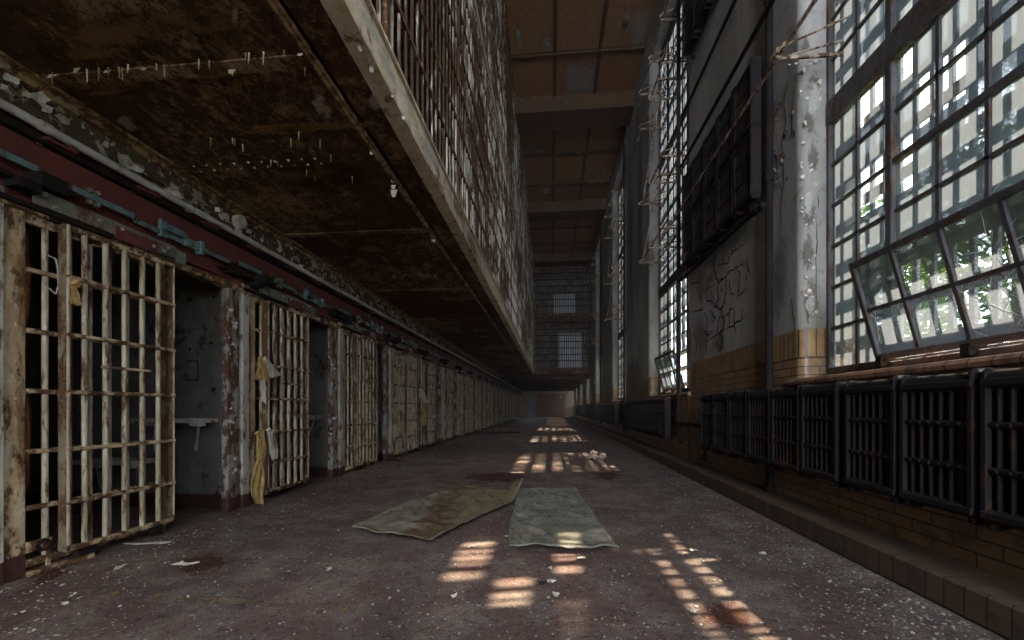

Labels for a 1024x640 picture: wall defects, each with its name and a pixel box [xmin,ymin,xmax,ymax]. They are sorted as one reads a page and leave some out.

peeling [0,57,150,176]
spalling [773,34,823,325]
crack [687,241,750,352]